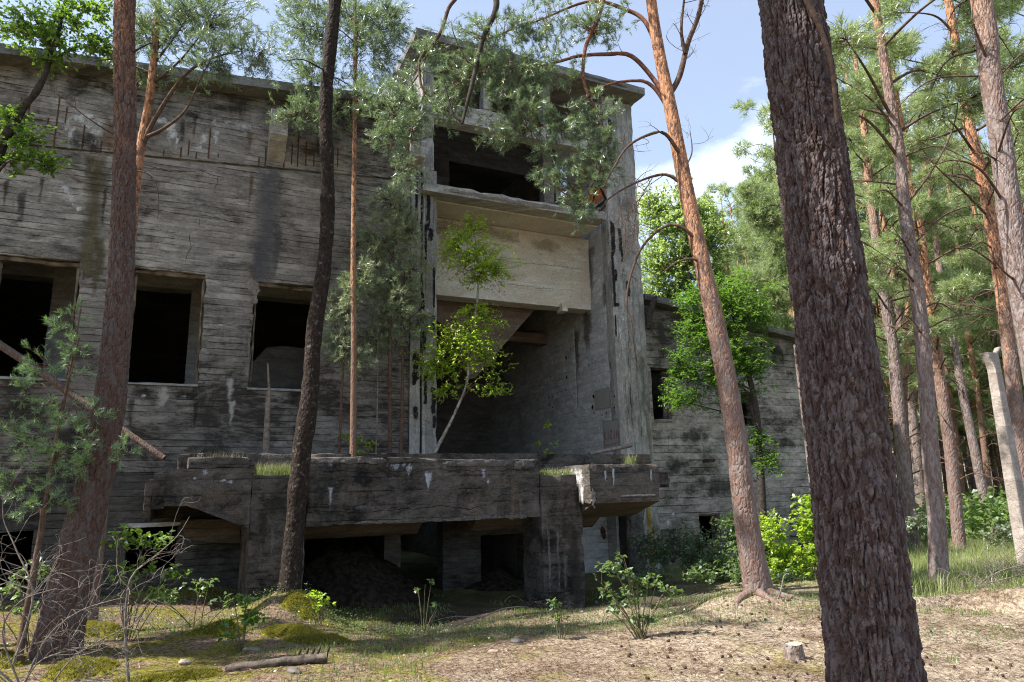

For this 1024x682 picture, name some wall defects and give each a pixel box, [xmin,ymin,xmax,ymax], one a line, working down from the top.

corrosion [47,97,68,147]
damp [62,158,106,289]
damp [412,175,437,428]
damp [588,220,630,335]
damp [227,379,235,421]